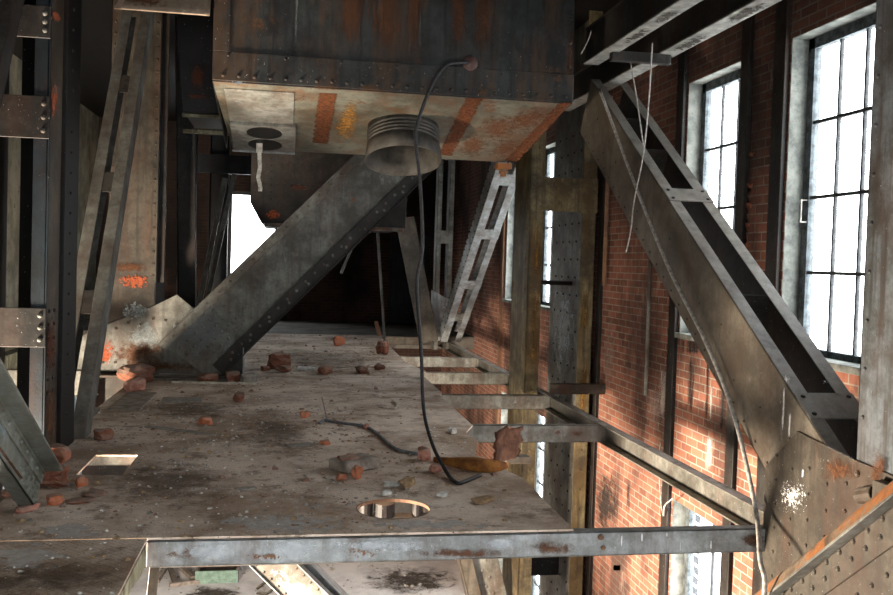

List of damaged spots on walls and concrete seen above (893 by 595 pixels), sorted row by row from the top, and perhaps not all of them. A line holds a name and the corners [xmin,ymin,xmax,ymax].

rust [310,86,356,144]
rust [441,98,572,162]
damp [597,475,616,528]
damp [781,470,807,512]
rust [423,549,496,558]
rust [535,542,569,553]